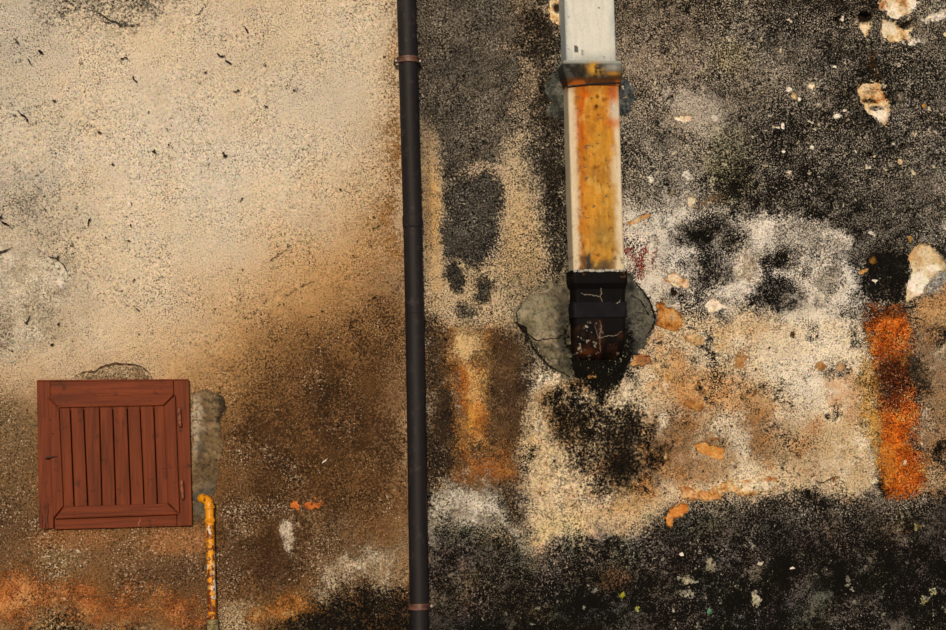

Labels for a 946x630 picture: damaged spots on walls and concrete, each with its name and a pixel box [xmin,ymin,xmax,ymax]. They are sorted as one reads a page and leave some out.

spalling [857,0,946,127]
water stain [416,0,528,323]
water stain [728,244,763,289]
water stain [767,216,849,302]
spalling [905,236,946,304]
water stain [223,288,410,630]
rust [443,325,522,487]
water stain [546,326,649,500]
spalling [694,441,725,461]
flaking render [662,466,784,528]
rust [850,303,934,533]
rust [0,563,208,630]